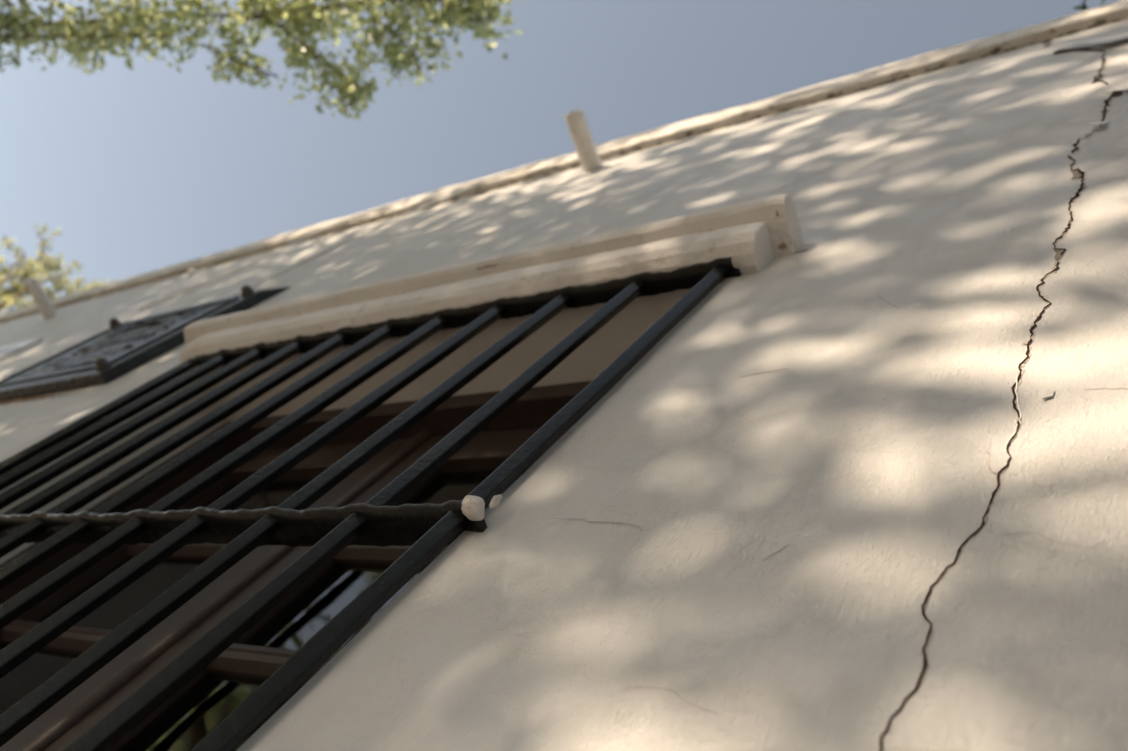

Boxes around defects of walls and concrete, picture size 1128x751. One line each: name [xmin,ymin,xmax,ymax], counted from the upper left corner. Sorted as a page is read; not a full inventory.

crack [879,53,1112,751]